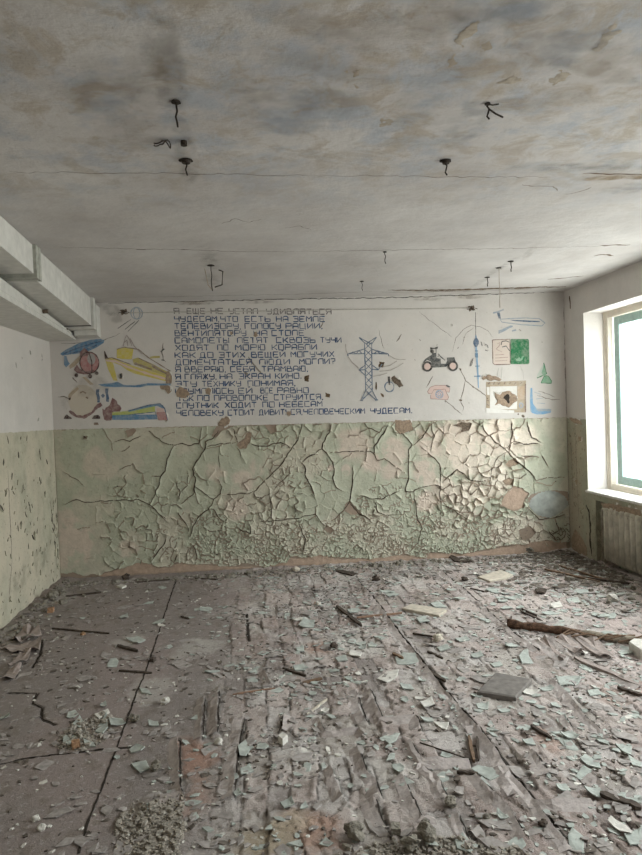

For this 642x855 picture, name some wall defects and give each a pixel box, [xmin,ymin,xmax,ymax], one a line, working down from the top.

peeling [193,686,254,801]
peeling [279,714,296,731]
crack [1,423,592,854]
spalling [0,371,642,689]
peeling [309,579,642,853]